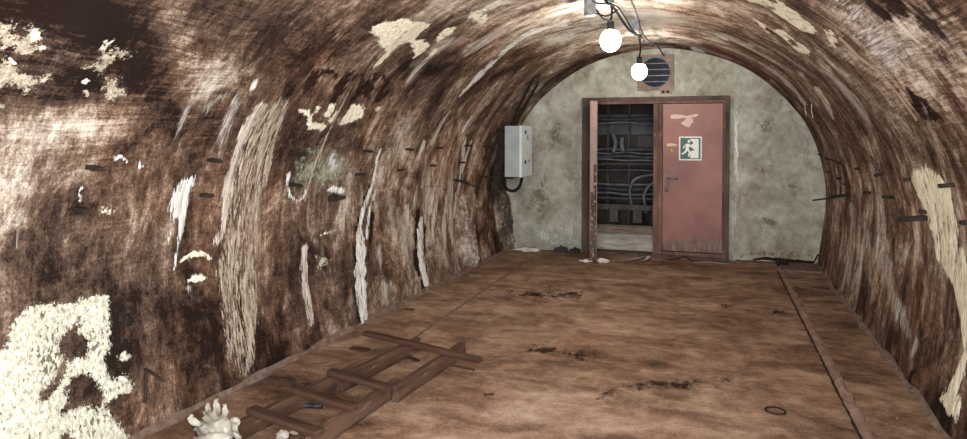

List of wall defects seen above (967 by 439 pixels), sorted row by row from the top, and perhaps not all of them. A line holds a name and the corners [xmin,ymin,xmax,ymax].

peeling [0,19,53,95]
peeling [81,40,133,107]
peeling [368,18,457,69]
peeling [747,0,838,57]
peeling [826,0,952,76]
peeling [298,103,384,132]
peeling [179,250,212,263]
peeling [187,274,208,291]
peeling [0,293,138,439]